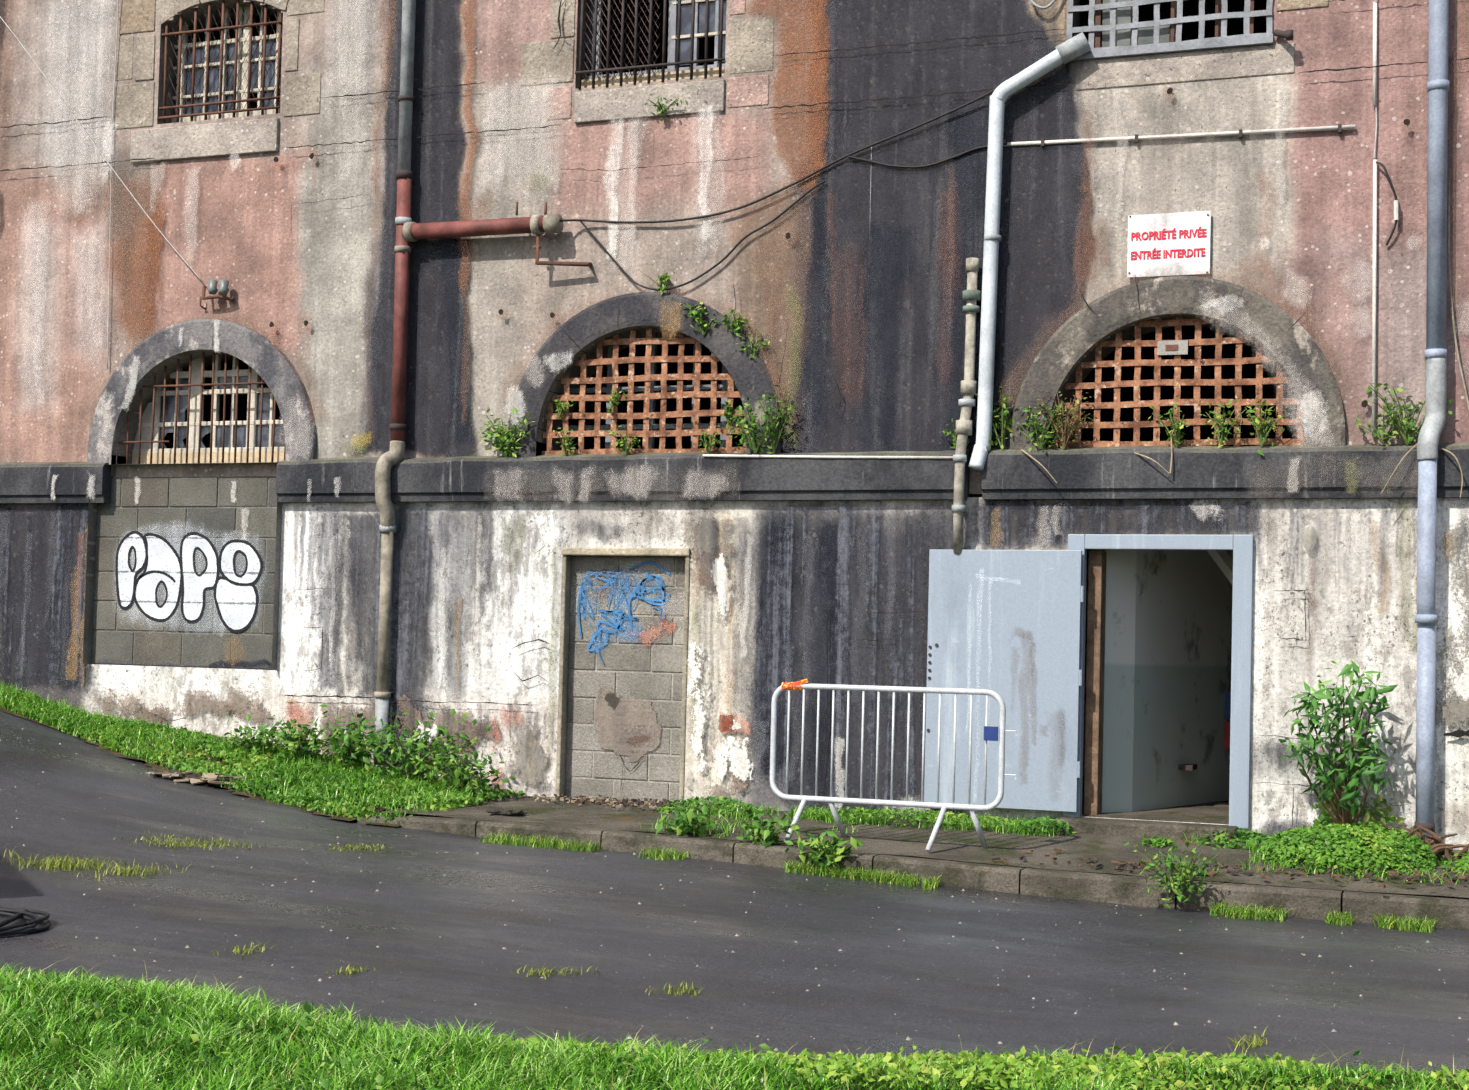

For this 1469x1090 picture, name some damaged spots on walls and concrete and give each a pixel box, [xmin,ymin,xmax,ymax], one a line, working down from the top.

corrosion [748,0,828,188]
leakage [781,0,1095,458]
spalling [593,685,662,762]
peeling [687,642,754,807]
leakage [745,499,1259,820]
peeling [1435,517,1469,730]